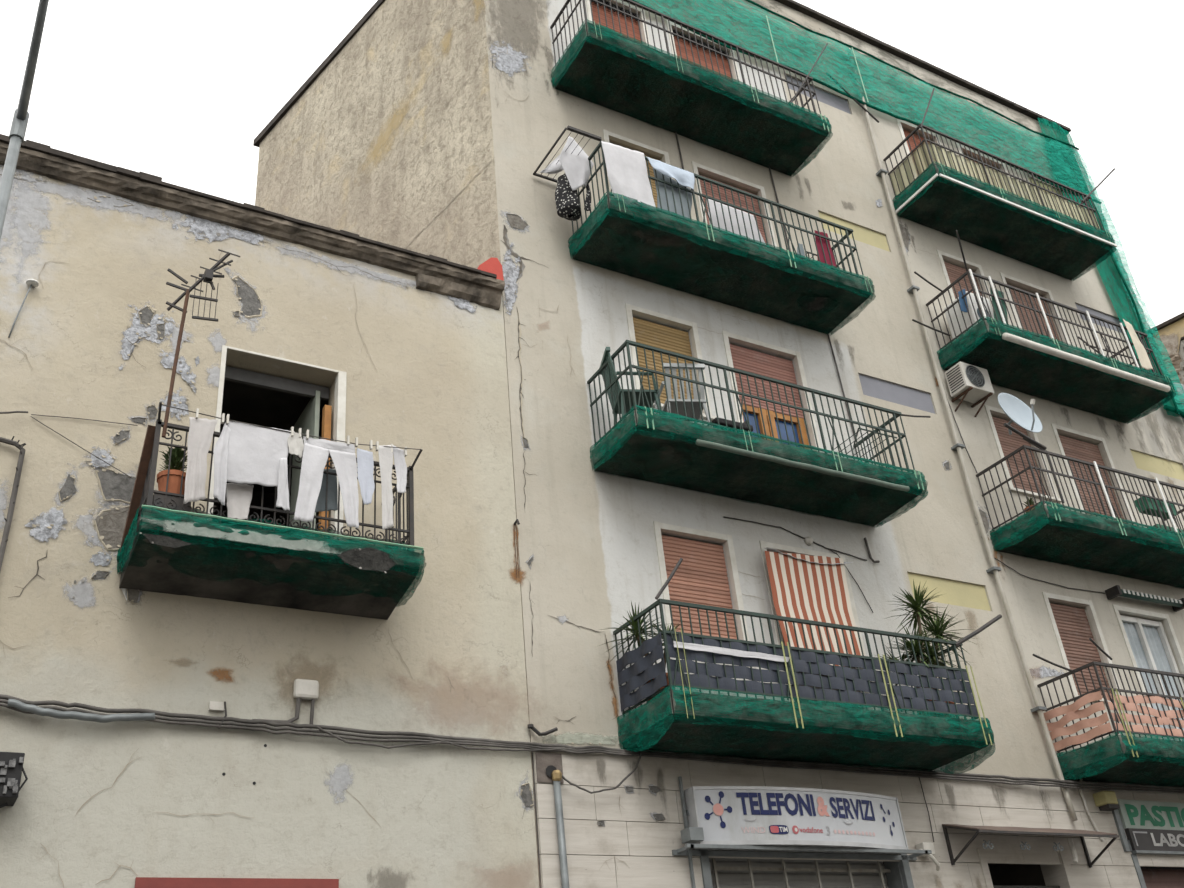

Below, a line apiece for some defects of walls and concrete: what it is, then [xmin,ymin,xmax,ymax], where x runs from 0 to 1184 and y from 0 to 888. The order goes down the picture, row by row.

peeling [490,41,531,77]
flaking render [225,269,267,331]
flaking render [24,302,200,608]
peeling [139,522,396,573]
rust [511,528,524,583]